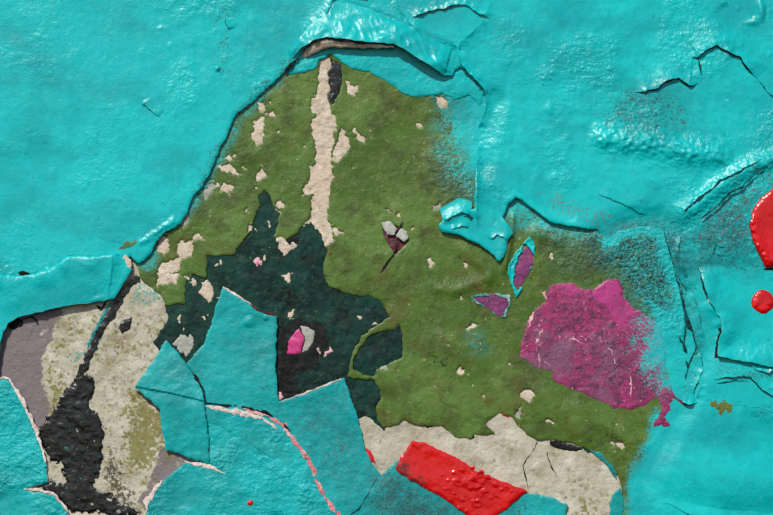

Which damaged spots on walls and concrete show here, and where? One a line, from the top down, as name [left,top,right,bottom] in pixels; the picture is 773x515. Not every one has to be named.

crack [635,0,773,98]
peeling [0,253,125,330]
spalling [0,275,140,515]
peeling [131,0,697,515]
crack [599,182,649,217]
crack [664,229,773,436]